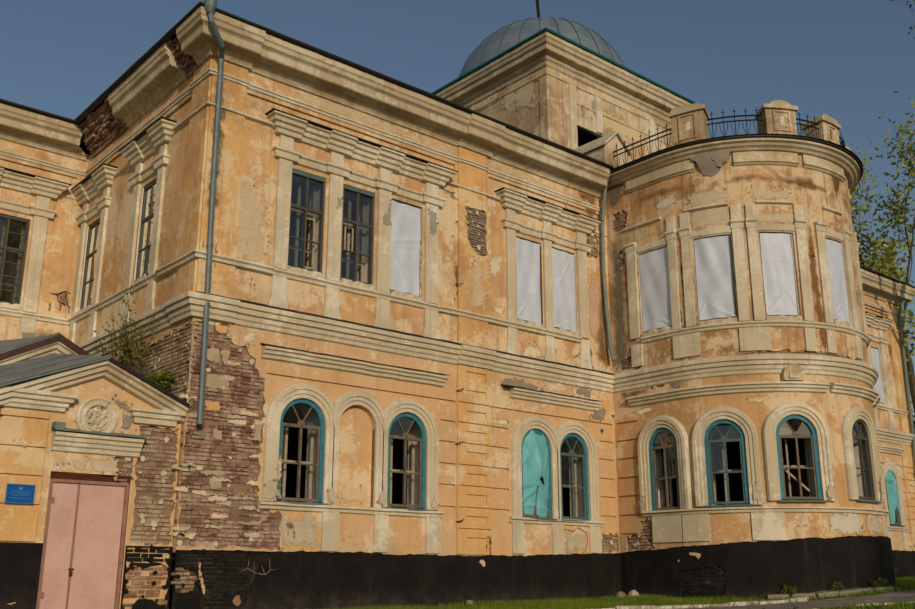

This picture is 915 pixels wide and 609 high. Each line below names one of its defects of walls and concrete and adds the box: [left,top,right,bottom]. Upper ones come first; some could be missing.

spalling [455,206,505,314]
spalling [586,233,600,257]
spalling [101,320,284,609]
spalling [602,496,654,553]